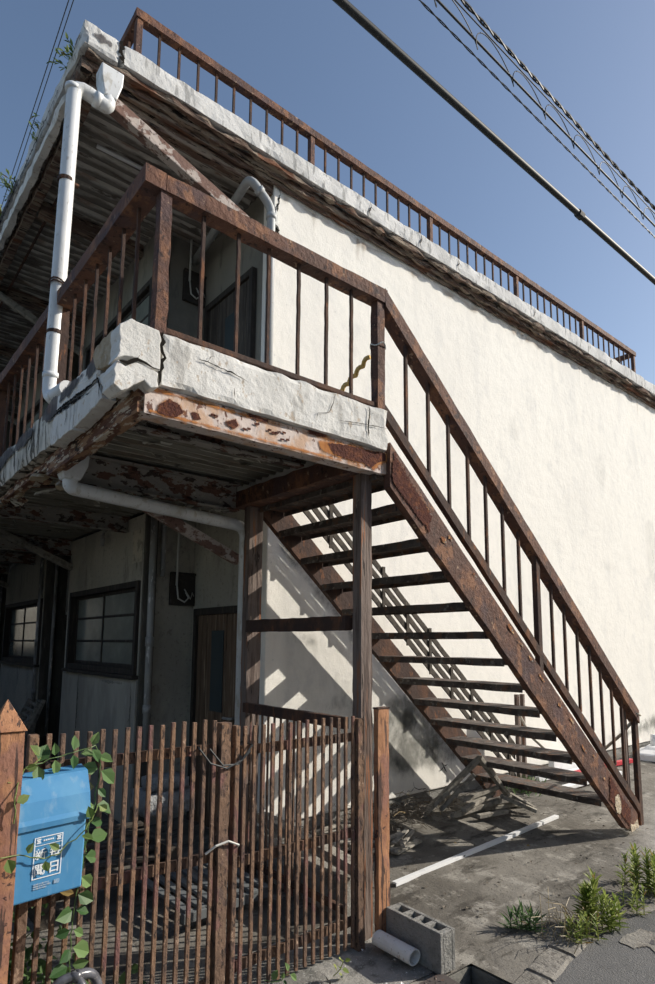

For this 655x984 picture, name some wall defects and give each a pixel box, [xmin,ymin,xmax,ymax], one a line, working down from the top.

crack [119,331,167,384]
crack [199,356,248,396]
crack [26,376,100,454]
peeling [309,429,387,470]
water stain [389,699,443,770]